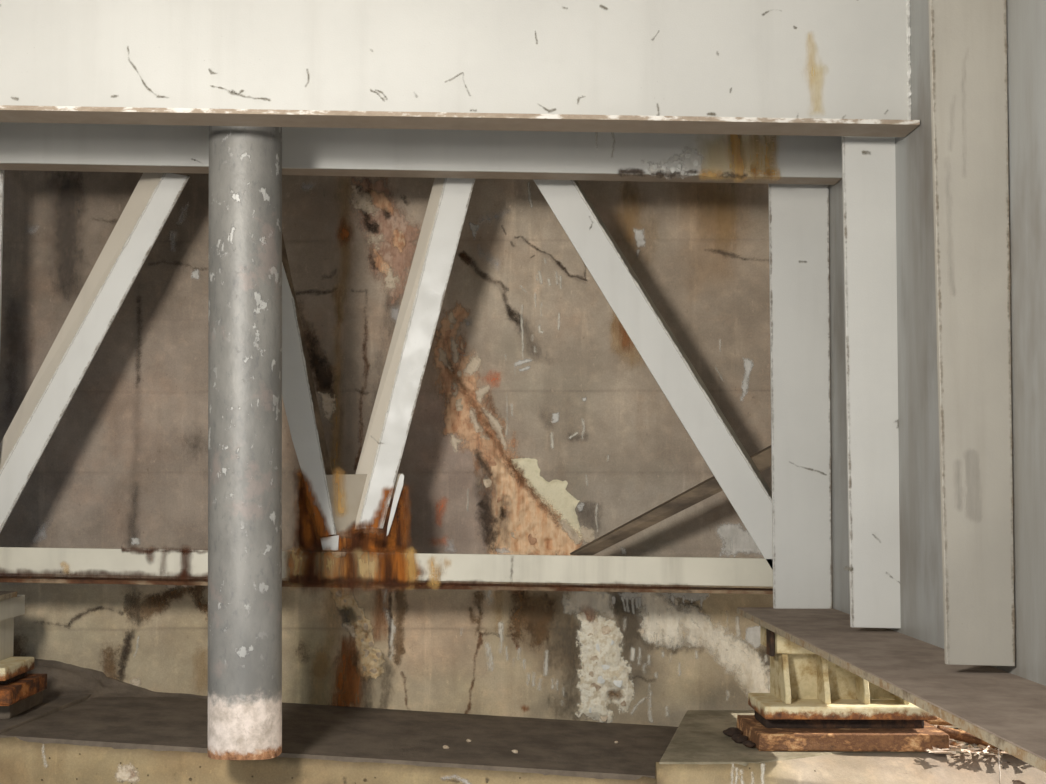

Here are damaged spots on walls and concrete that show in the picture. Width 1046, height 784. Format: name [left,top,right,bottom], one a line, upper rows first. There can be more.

spalling [351,177,420,304]
crack [460,253,506,303]
crack [503,229,584,280]
crack [354,325,369,470]
spalling [433,303,595,556]
rust [0,570,149,578]
rust [122,547,208,581]
rust [287,471,491,664]
damp [119,585,208,687]
rust [333,640,361,707]
damp [487,590,770,723]